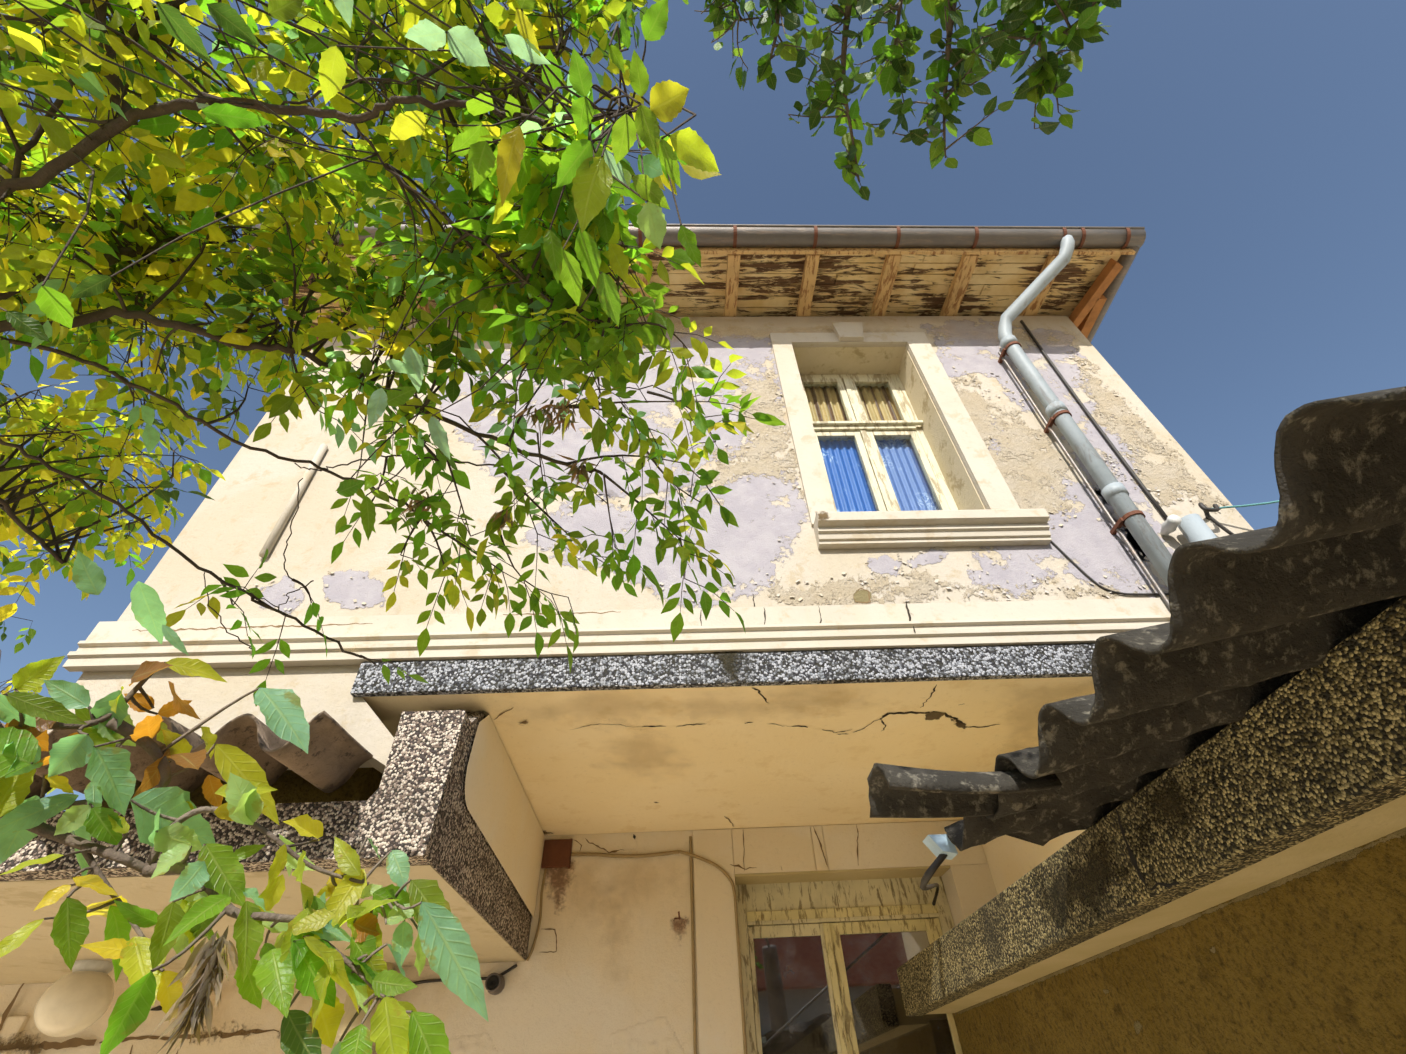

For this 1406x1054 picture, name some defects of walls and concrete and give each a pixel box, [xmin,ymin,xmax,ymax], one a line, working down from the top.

peeling [436,318,1235,608]
peeling [254,575,304,615]
peeling [323,569,385,610]
crack [576,722,702,730]
crack [745,685,999,735]
crack [0,983,280,1054]